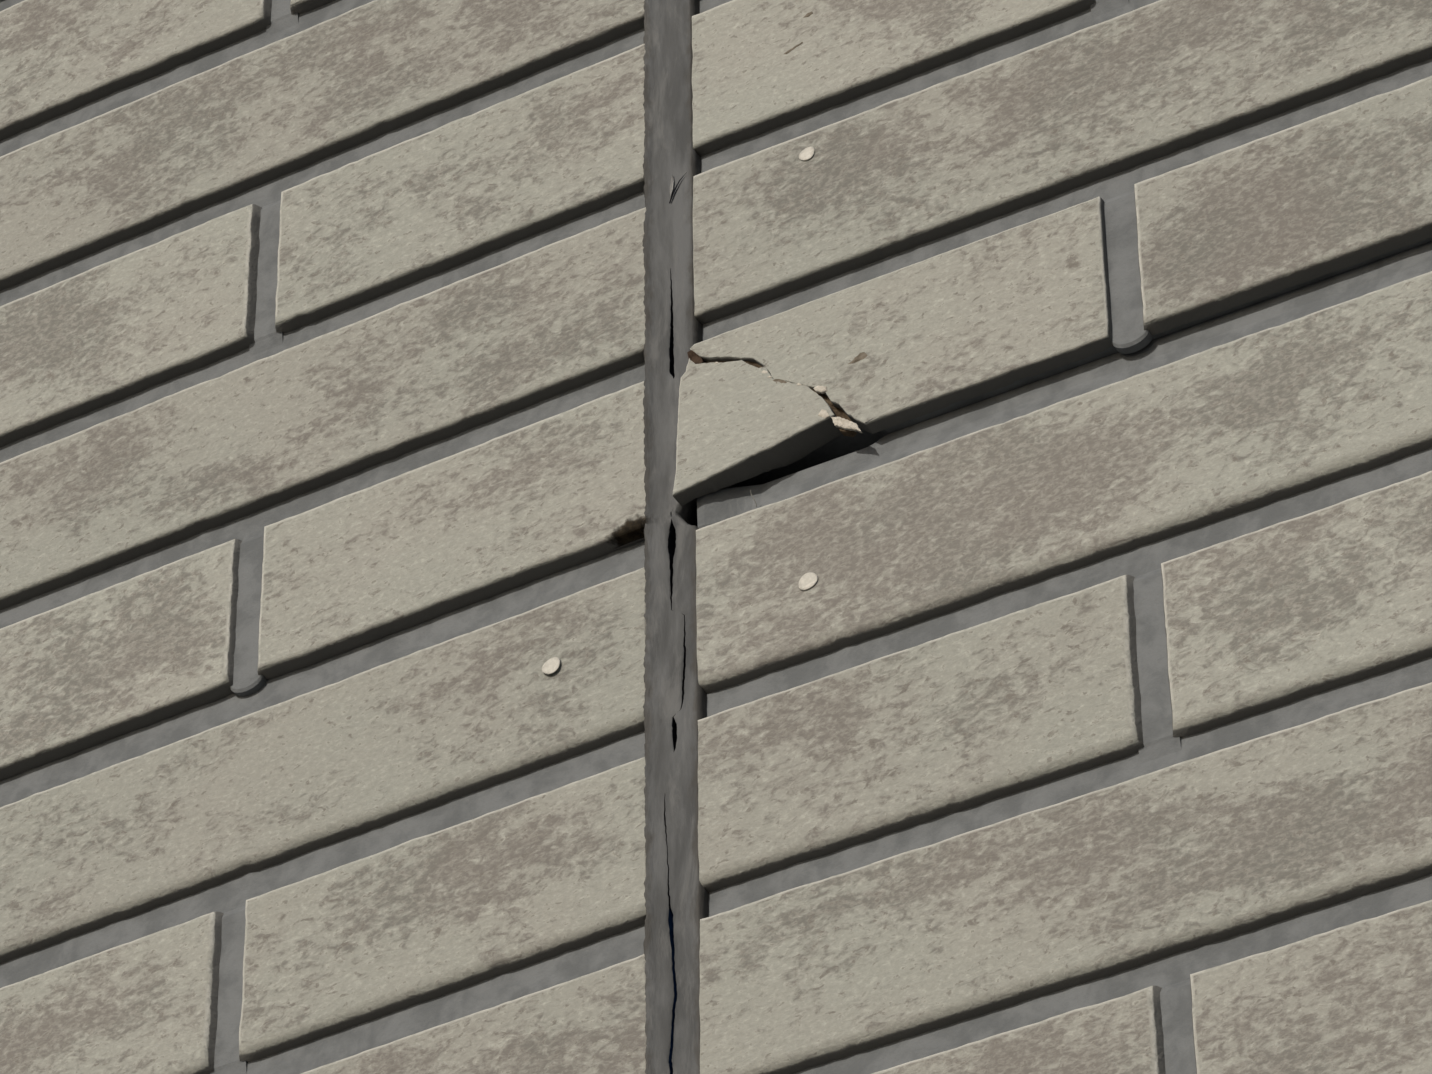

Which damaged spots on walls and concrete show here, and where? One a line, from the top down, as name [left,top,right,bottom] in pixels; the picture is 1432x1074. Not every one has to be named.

crack [669,268,853,422]
crack [668,518,686,751]
crack [664,797,677,1074]